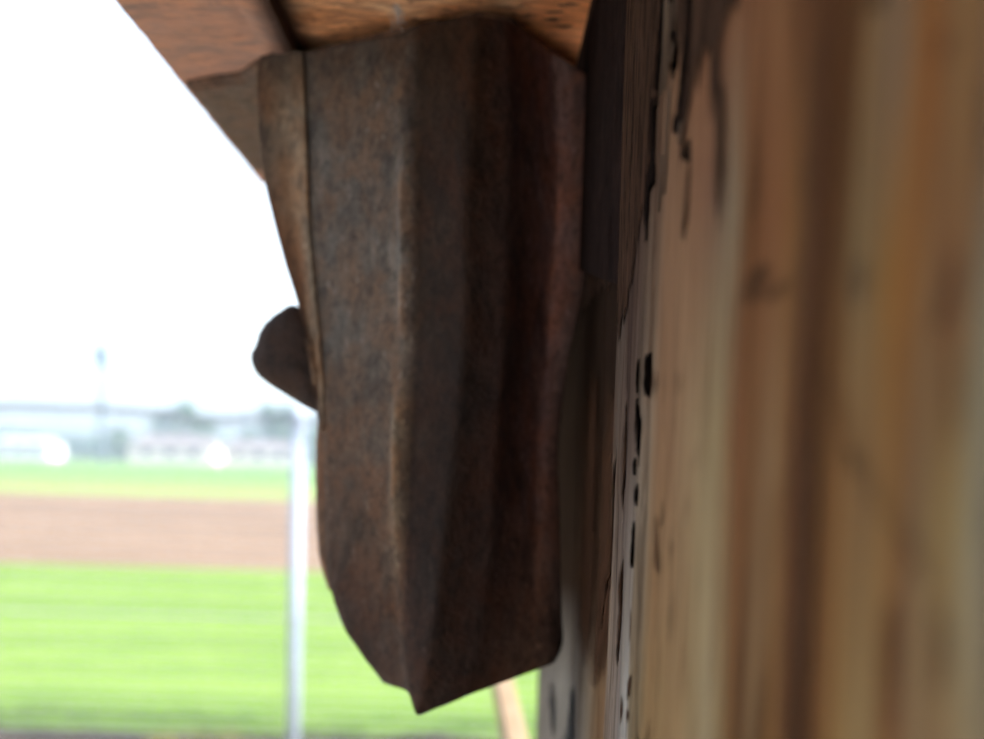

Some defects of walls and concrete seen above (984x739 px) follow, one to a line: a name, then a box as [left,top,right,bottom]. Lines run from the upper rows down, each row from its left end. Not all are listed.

peeling [576,0,738,341]